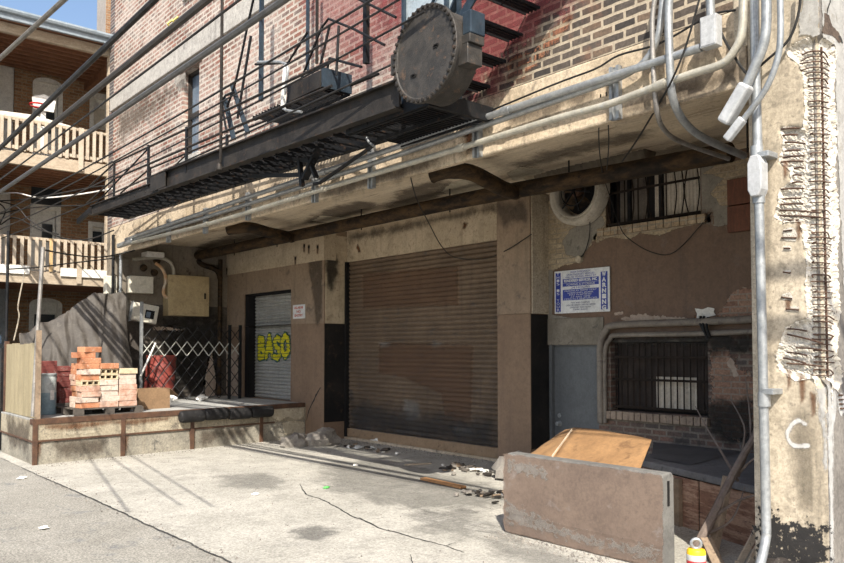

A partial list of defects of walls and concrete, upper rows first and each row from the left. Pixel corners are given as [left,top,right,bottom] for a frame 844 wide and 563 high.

spalling [774,0,844,416]
peeling [717,286,752,317]
peeling [708,349,754,424]
rust [800,375,815,414]
crack [24,468,232,563]
crack [300,485,462,563]